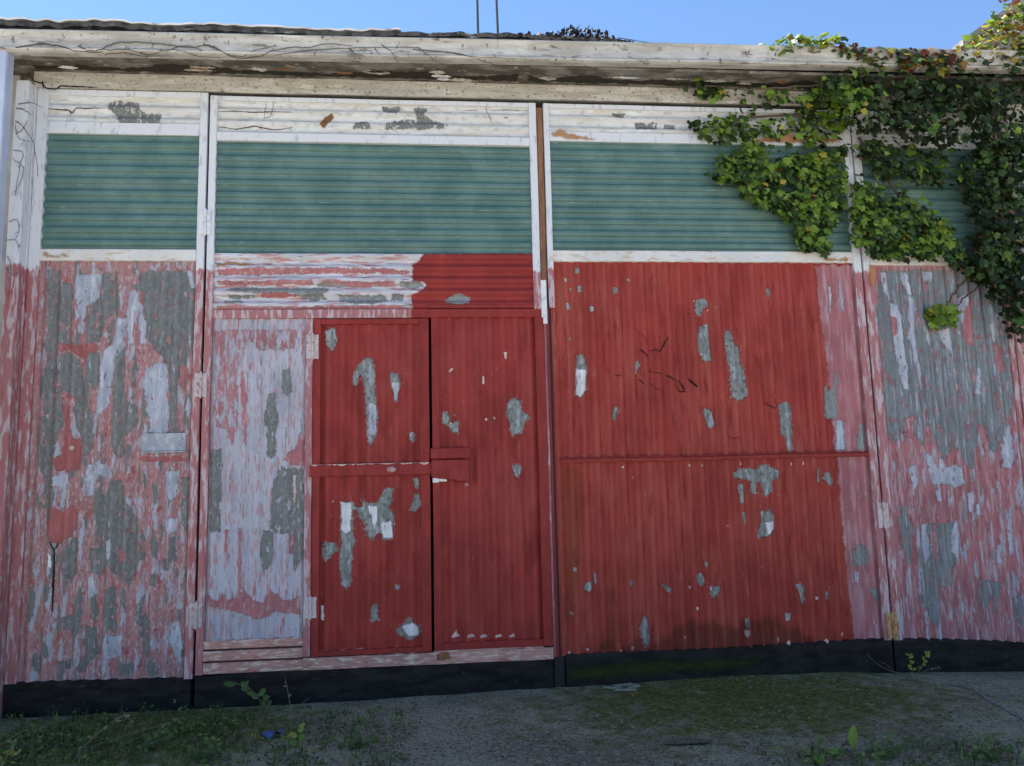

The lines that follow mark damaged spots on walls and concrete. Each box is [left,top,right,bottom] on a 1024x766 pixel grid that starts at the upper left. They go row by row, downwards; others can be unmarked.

peeling [108,100,162,123]
peeling [382,106,448,131]
corrosion [552,129,589,139]
peeling [224,281,424,305]
peeling [574,344,589,408]
crack [617,334,698,392]
peeling [693,297,748,402]
peeling [877,268,1017,515]
peeling [41,269,195,672]
peeling [260,357,429,590]
peeling [731,395,804,540]
peeling [369,602,422,654]